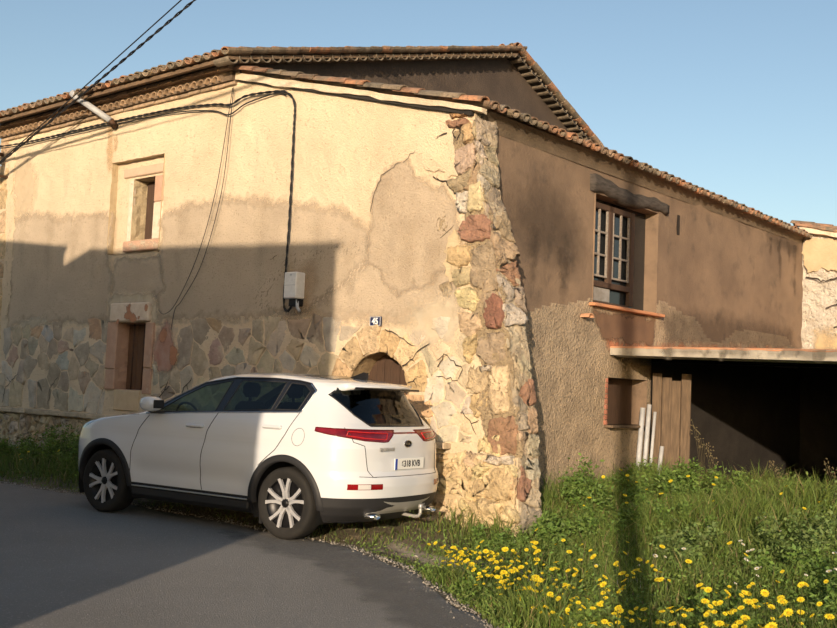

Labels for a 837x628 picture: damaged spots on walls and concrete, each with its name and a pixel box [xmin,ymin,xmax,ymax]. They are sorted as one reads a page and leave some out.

spalling [423,130,475,178]
spalling [436,188,494,297]
peeling [802,237,837,273]
spalling [471,283,520,436]